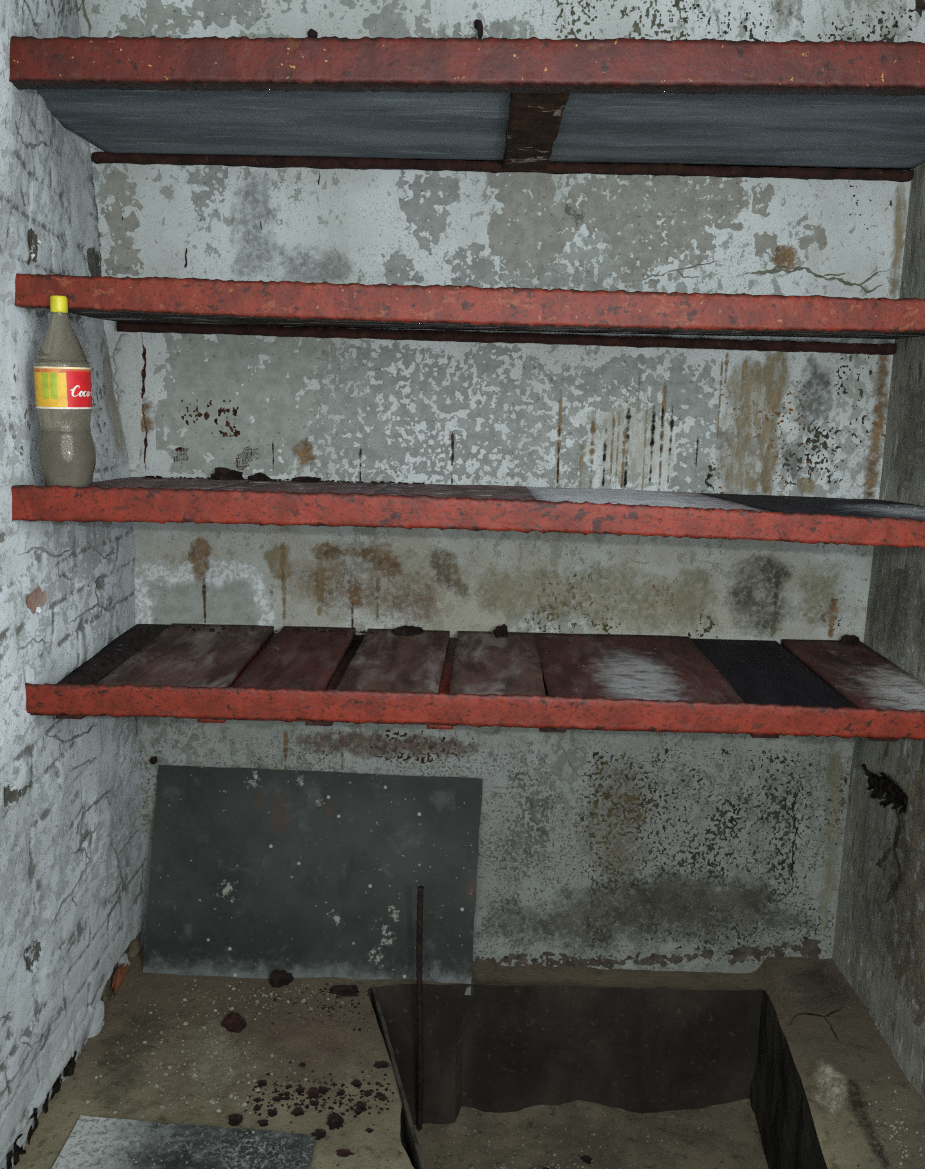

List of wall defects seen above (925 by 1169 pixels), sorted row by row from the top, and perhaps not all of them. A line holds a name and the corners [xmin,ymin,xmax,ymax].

crack [633,261,715,281]
crack [740,266,893,293]
corrosion [717,351,786,494]
corrosion [864,355,888,498]
corrosion [189,539,210,623]
corrosion [314,543,400,618]
damp [801,575,862,637]
crack [50,788,143,926]
damp [473,746,849,953]
peeling [861,758,925,1026]
spalling [474,939,822,969]
spalling [3,1051,77,1169]